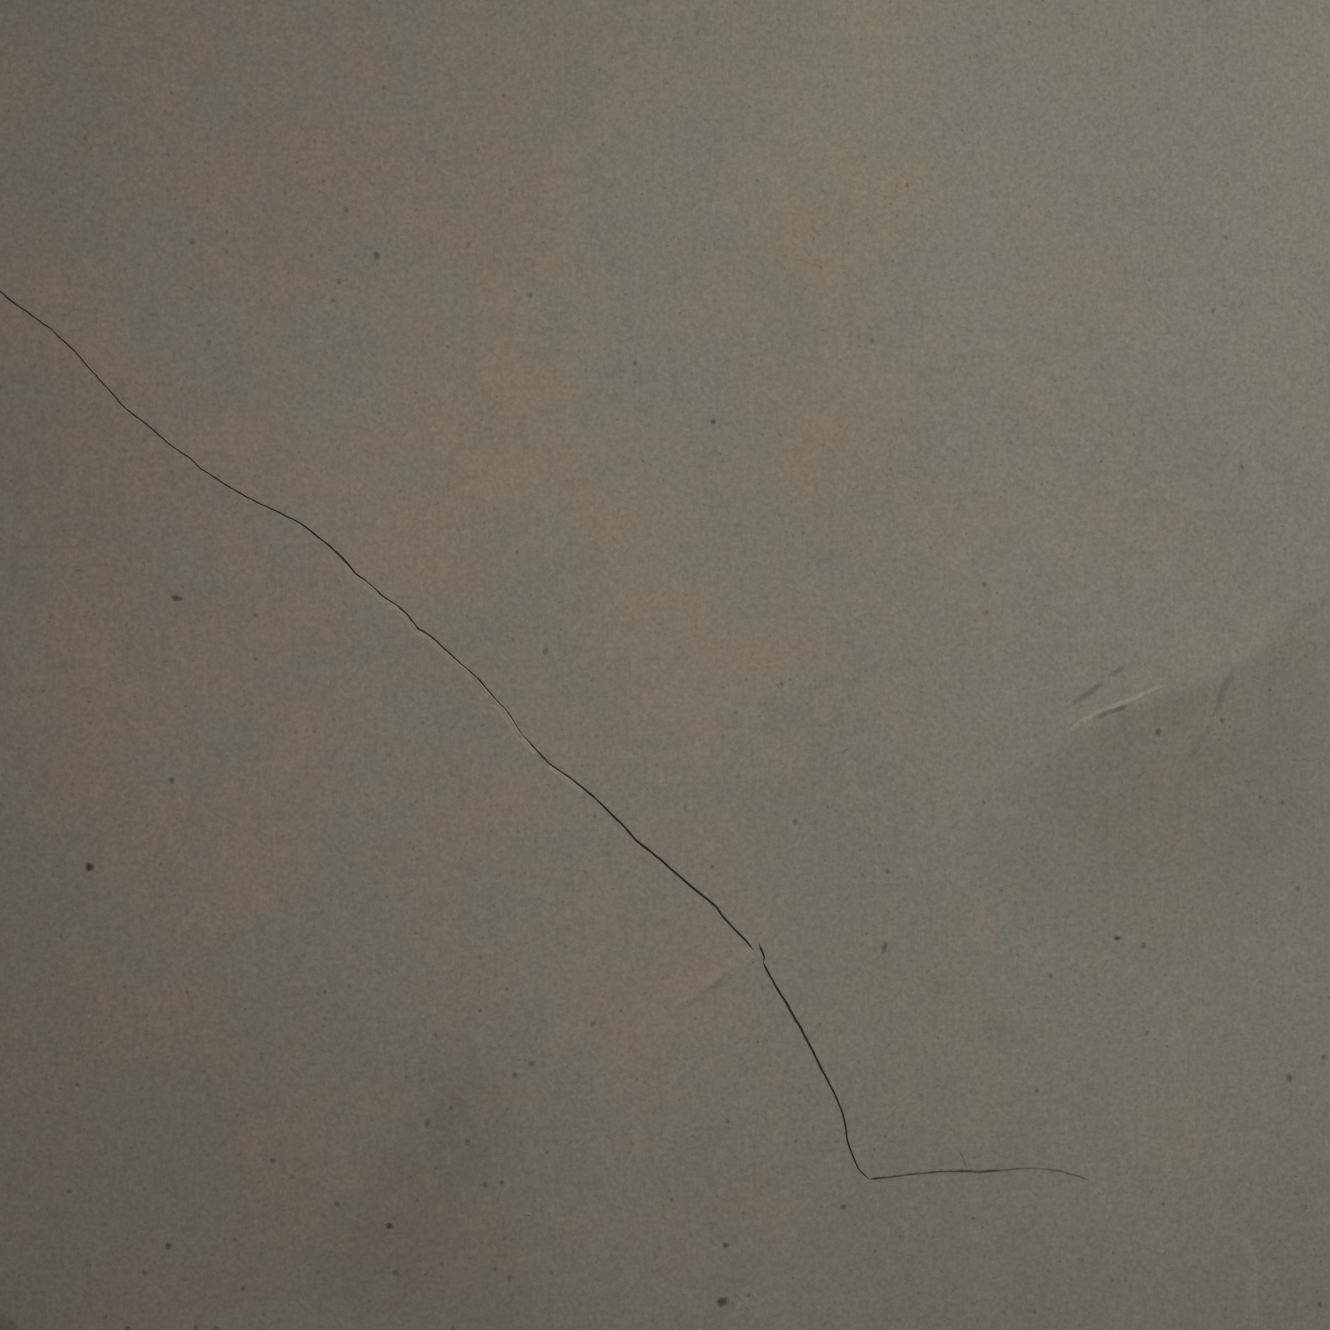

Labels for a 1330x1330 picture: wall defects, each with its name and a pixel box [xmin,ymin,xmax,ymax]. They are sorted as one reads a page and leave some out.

crack [0,291,996,1179]